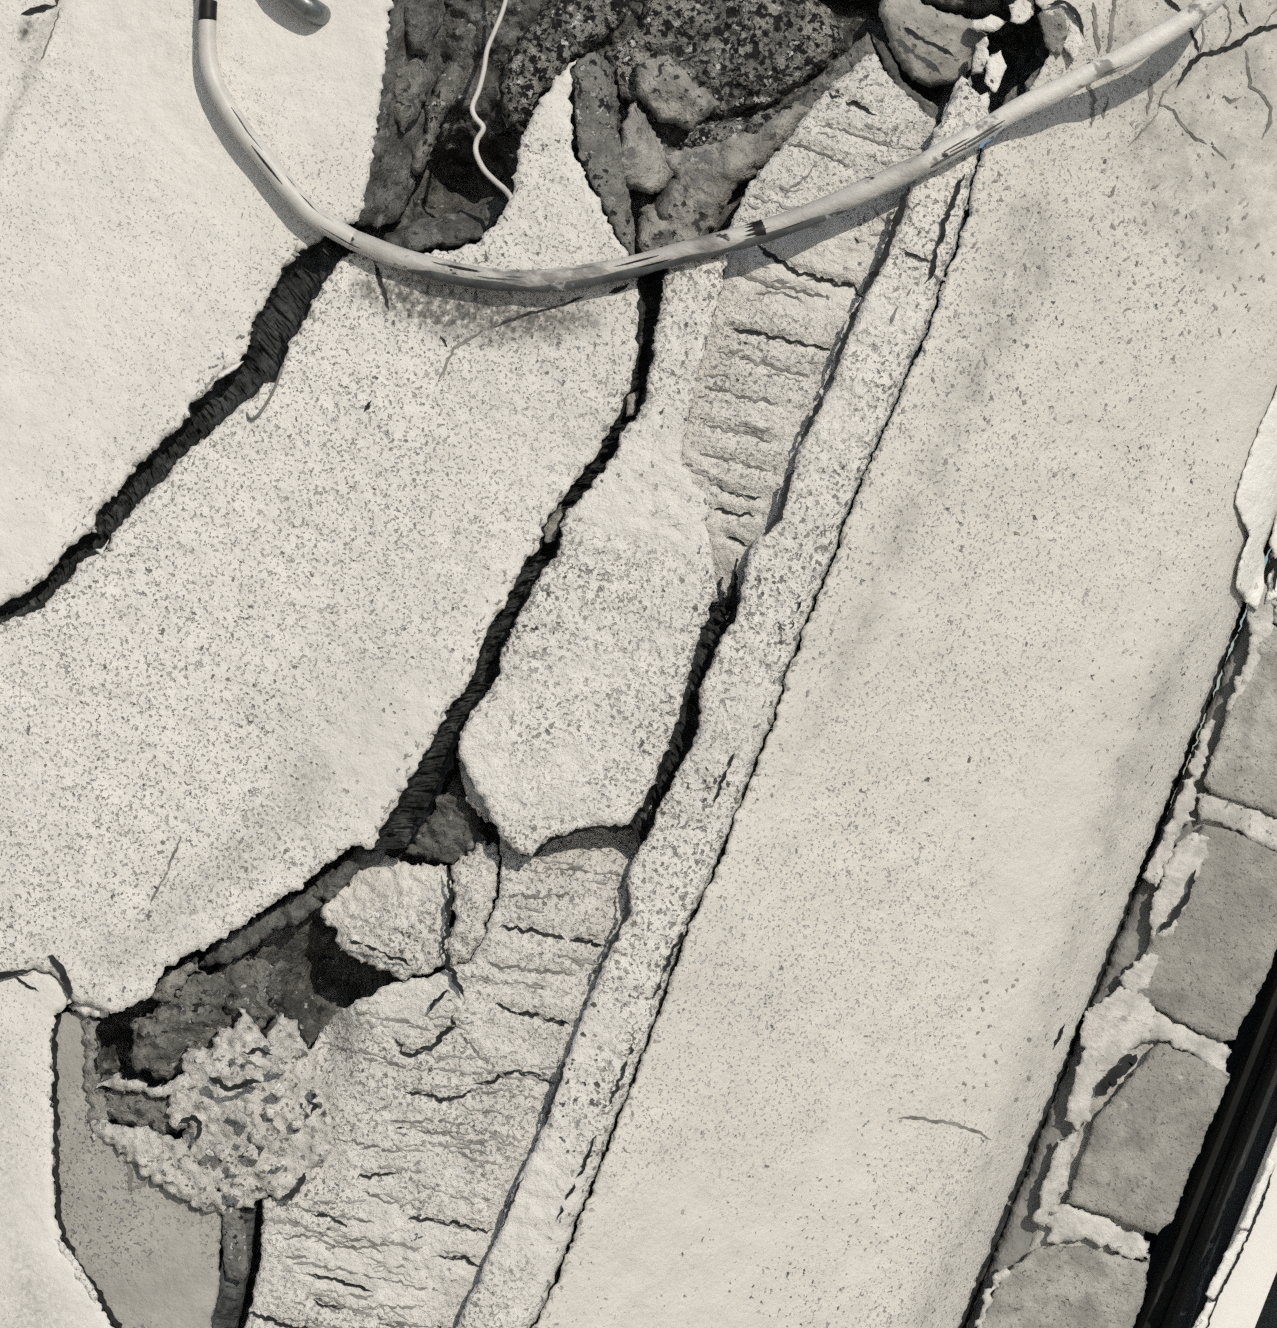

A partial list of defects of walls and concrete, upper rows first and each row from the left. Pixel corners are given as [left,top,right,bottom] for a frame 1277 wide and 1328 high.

crack [21,0,60,62]
spalling [349,0,1085,256]
crack [1129,0,1277,158]
crack [0,236,389,629]
crack [371,249,674,850]
flaking render [681,180,915,623]
peeling [1235,388,1277,611]
crack [521,148,1003,1328]
crack [0,955,73,999]
flaking render [49,741,652,1328]
spalling [1095,1054,1138,1097]
peeling [1193,1156,1275,1328]